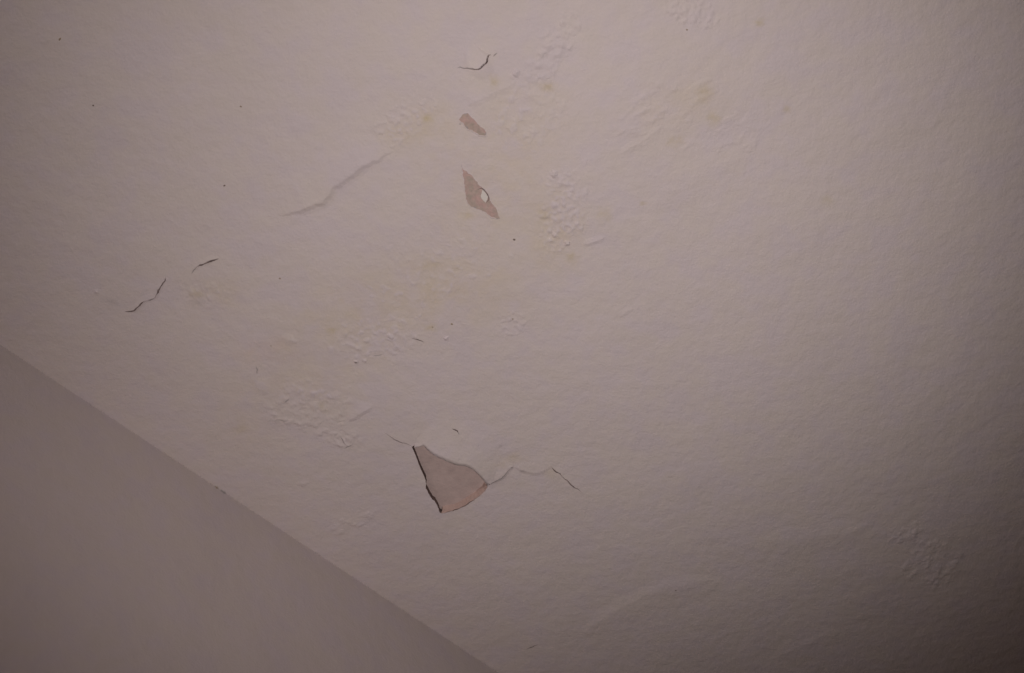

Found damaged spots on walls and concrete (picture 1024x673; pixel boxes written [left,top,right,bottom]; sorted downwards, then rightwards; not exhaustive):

peeling [458,112,487,137]
peeling [461,164,500,220]
crack [126,278,166,312]
flaking render [412,446,487,513]